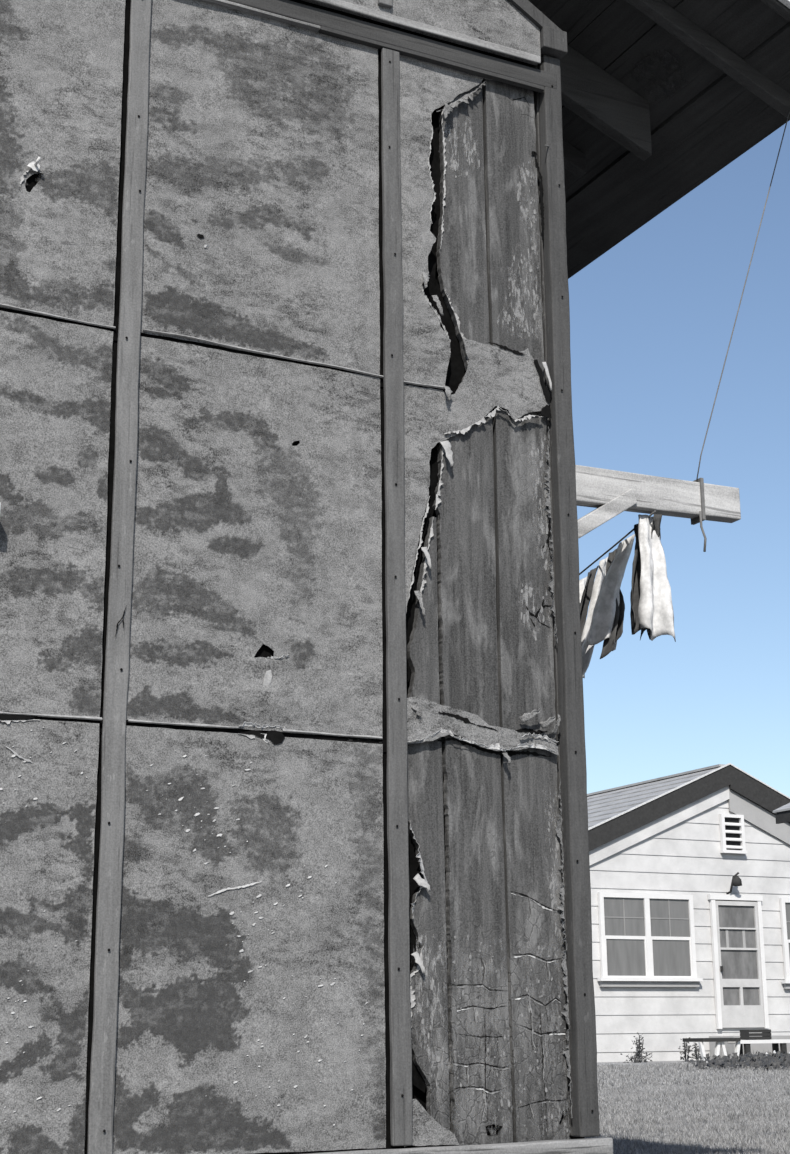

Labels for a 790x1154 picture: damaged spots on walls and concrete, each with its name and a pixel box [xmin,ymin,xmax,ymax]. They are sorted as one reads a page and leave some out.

peeling [444,118,480,178]
peeling [497,162,541,338]
damp [134,425,262,557]
peeling [528,436,549,571]
peeling [521,583,556,641]
damp [0,954,88,1084]
damp [0,799,96,945]
damp [116,882,253,1066]
peeling [414,791,568,1133]
crack [448,953,566,1121]
crack [511,891,560,915]
damp [113,1074,291,1153]